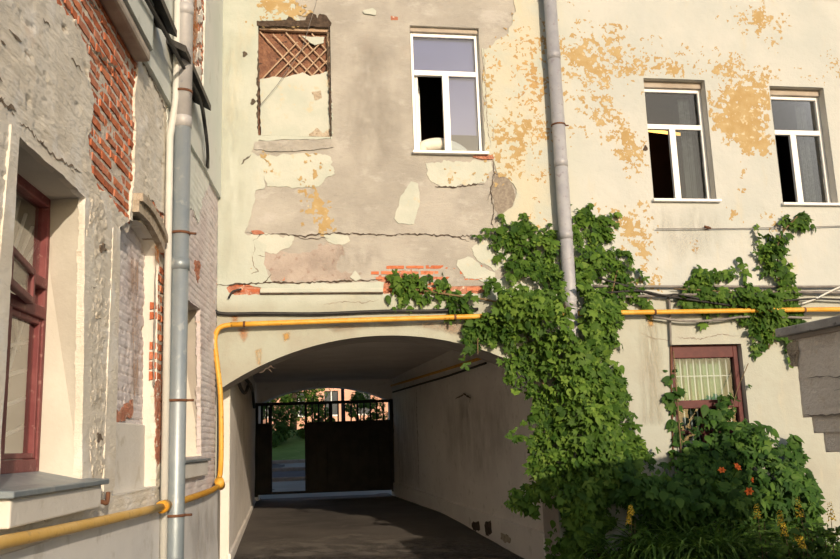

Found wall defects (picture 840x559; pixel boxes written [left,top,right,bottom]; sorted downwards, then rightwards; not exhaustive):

flaking render [193,0,204,83]
crack [254,51,262,132]
flaking render [245,0,553,295]
peeling [559,10,782,193]
peeling [715,0,790,53]
flaking render [57,0,137,478]
flaking render [149,253,164,466]
flaking render [227,284,262,295]
crack [217,162,496,305]
peeling [591,198,663,301]